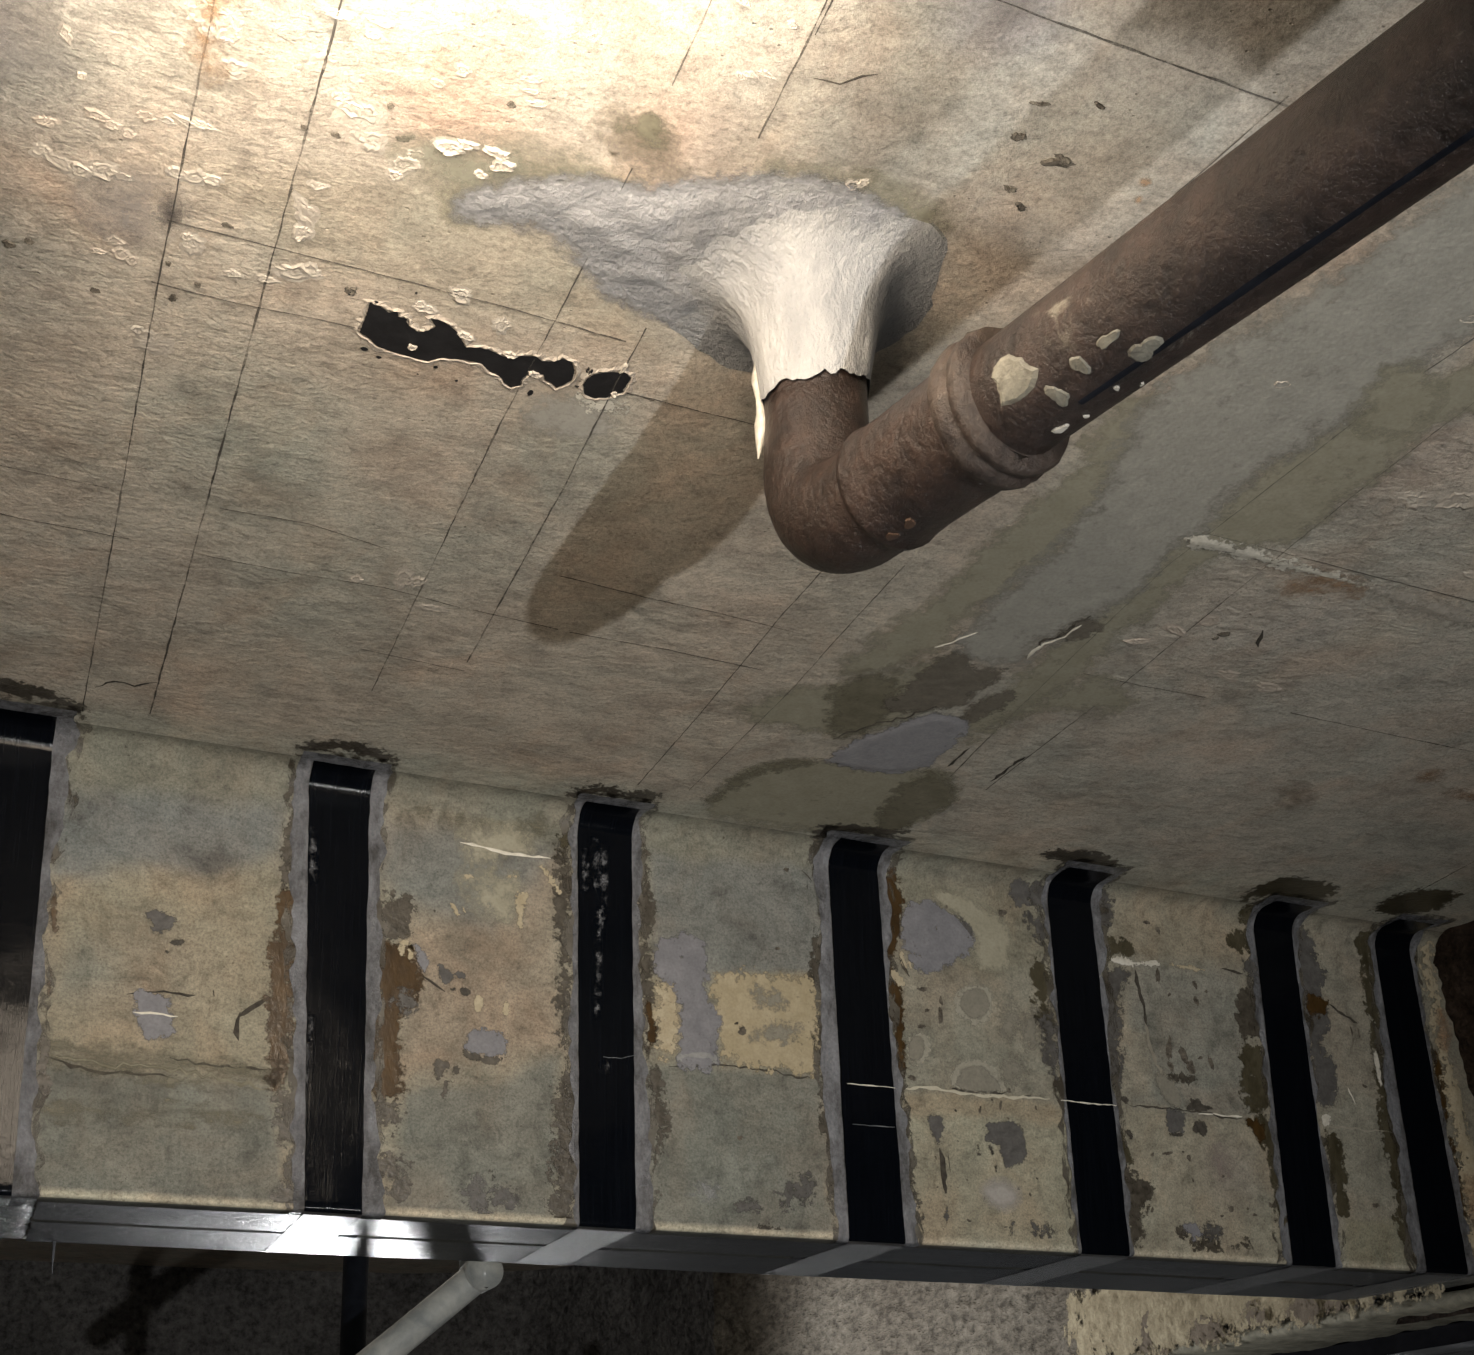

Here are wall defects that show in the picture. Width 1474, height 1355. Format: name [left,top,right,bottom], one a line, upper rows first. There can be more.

peeling [344,285,637,438]
leakage [746,363,1474,744]
leakage [706,759,958,877]
rust [262,783,296,1163]
rust [372,889,425,1204]
peeling [651,980,683,1063]
peeling [708,965,822,1079]
leakage [807,934,821,993]
crack [906,1086,1047,1100]
peeling [1063,1283,1445,1355]